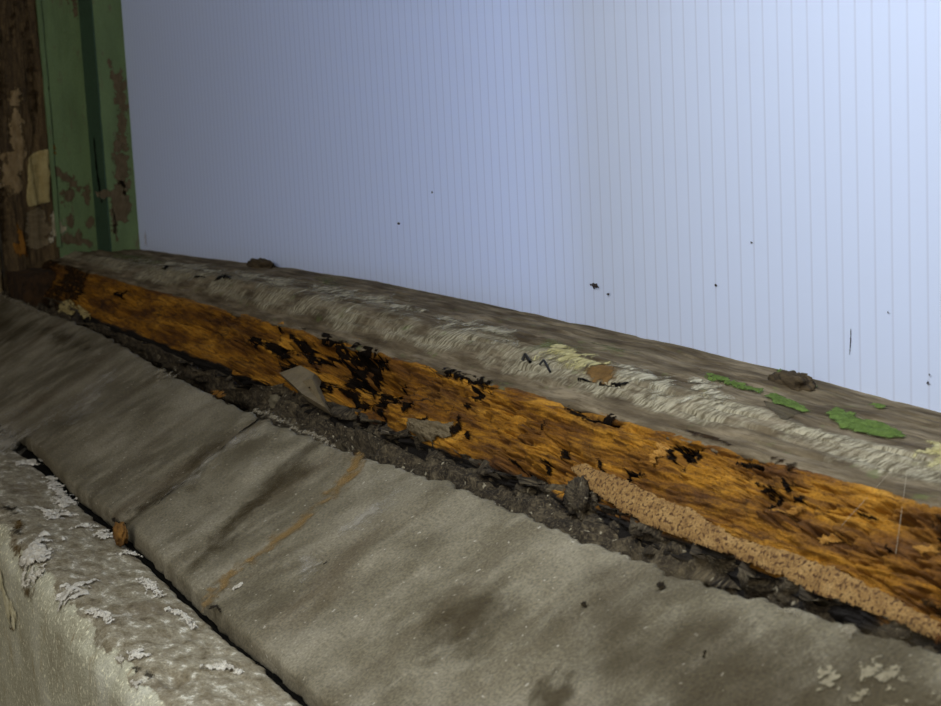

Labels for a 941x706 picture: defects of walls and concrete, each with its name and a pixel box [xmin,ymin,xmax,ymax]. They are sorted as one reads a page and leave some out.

peeling [26,58,132,248]
spalling [247,326,492,447]
spalling [564,406,620,428]
peeling [764,400,805,419]
spalling [508,449,571,485]
spalling [666,445,703,471]
spalling [755,478,809,509]
spalling [55,578,99,612]
spalling [84,607,115,624]
spalling [135,576,198,630]
spalling [114,648,153,689]
spalling [200,660,245,675]